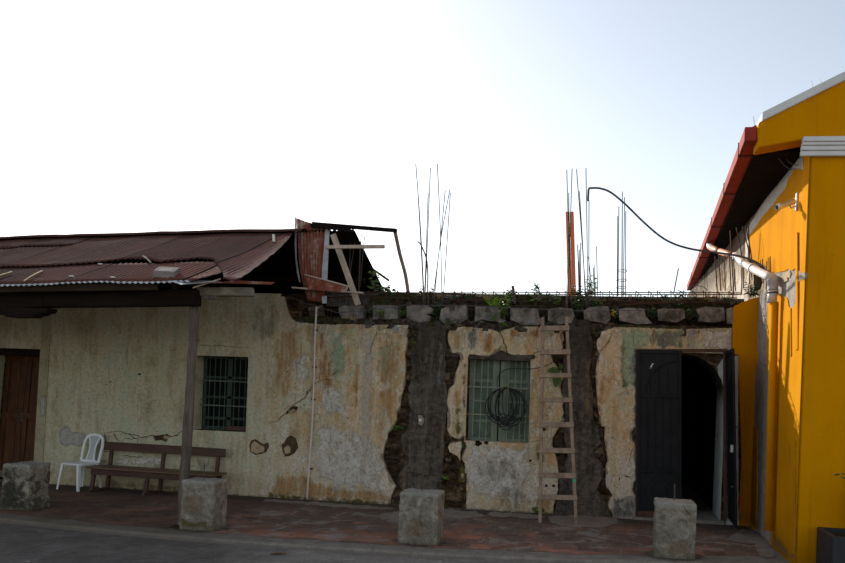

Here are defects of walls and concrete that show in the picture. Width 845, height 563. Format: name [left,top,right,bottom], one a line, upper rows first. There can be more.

rust [295,217,354,304]
flaking render [590,321,616,387]
peeling [688,157,807,545]
crack [101,430,183,462]
flaking render [250,439,269,455]
flaking render [282,435,298,457]
crack [270,371,338,423]
leakage [313,334,384,493]
flaking render [384,329,418,504]
flaking render [443,430,469,503]
flaking render [553,432,568,472]
flaking render [593,406,636,519]